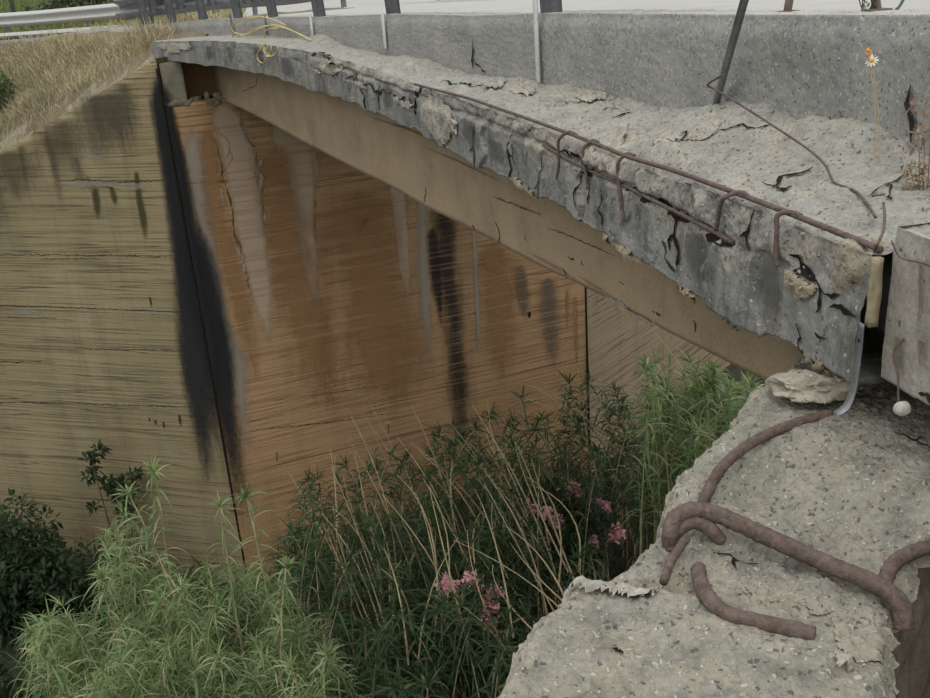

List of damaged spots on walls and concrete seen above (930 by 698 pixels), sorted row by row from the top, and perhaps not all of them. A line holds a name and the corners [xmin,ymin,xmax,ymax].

crack [67,178,164,191]
damp [151,83,247,481]
crack [188,82,264,296]
damp [213,105,271,333]
damp [390,187,467,423]
spalling [391,83,884,301]
crack [667,123,769,142]
crack [763,167,813,191]
spalling [565,408,930,630]
spalling [690,562,885,672]